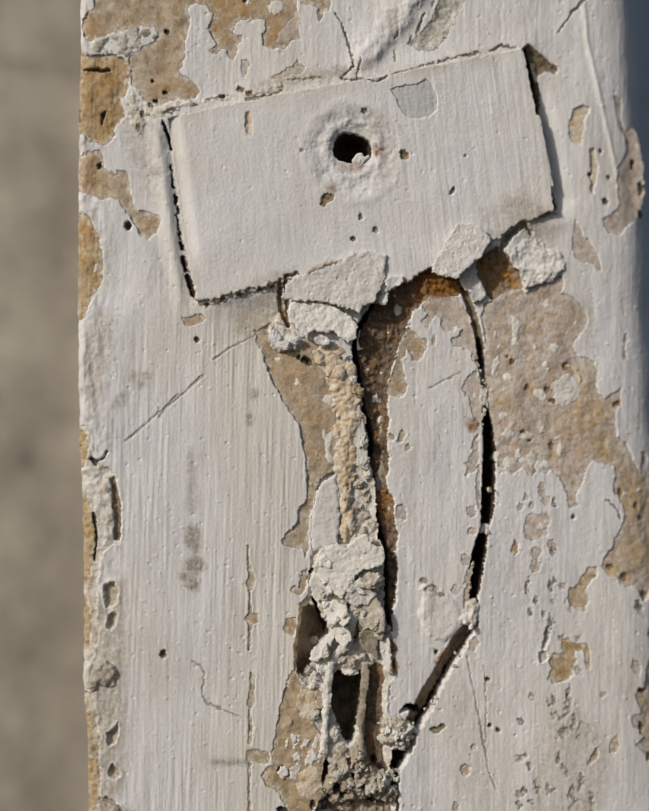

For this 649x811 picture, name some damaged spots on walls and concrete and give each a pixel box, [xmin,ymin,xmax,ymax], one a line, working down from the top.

peeling [78,213,103,320]
peeling [78,0,331,239]
peeling [320,193,334,207]
peeling [587,97,646,235]
spalling [79,425,122,666]
spalling [183,250,404,811]
crack [429,287,498,603]
peeling [387,223,649,765]
spalling [85,691,123,811]
crack [389,624,496,810]
peeling [516,778,556,809]
peeling [567,773,595,811]